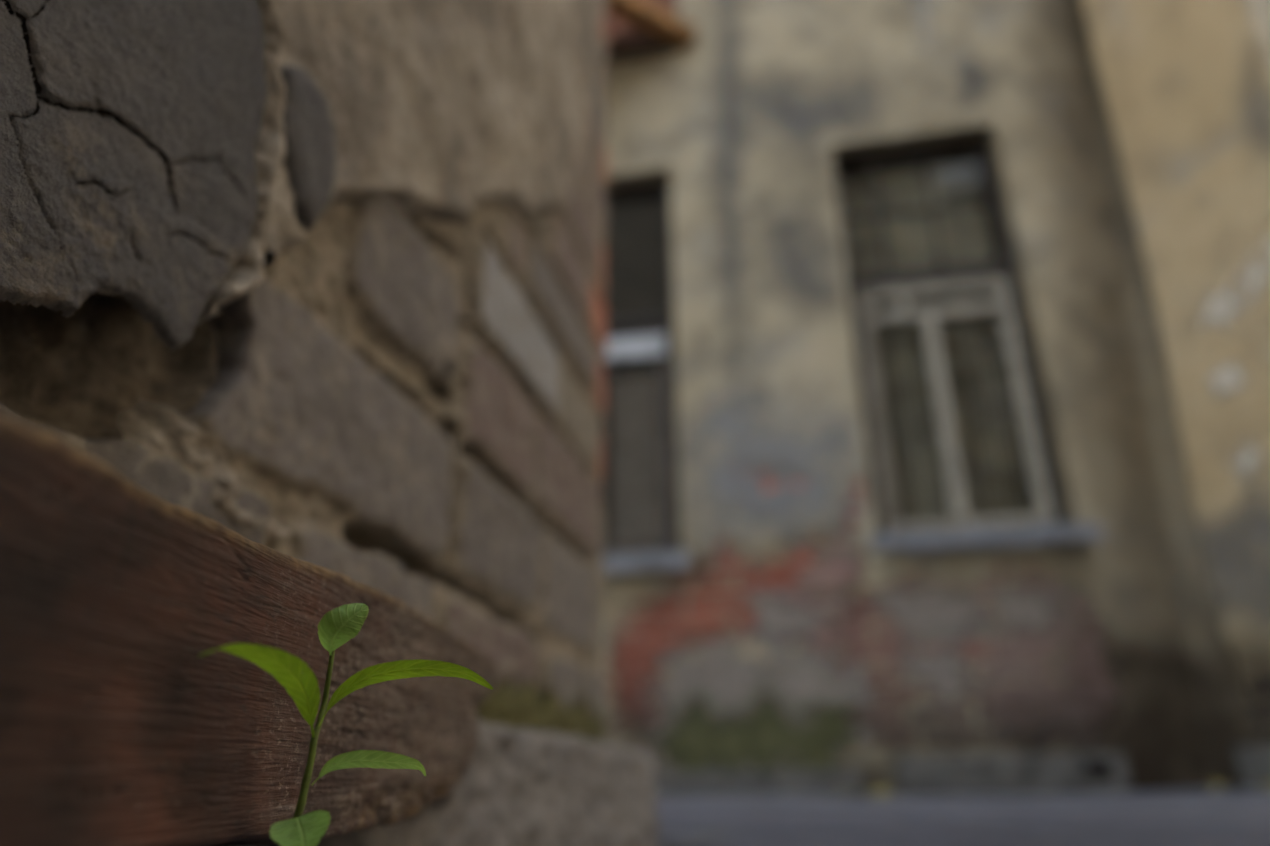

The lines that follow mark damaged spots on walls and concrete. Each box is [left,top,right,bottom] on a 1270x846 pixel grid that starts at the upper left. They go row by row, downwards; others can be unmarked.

crack [2,0,245,259]
leakage [1197,502,1270,623]